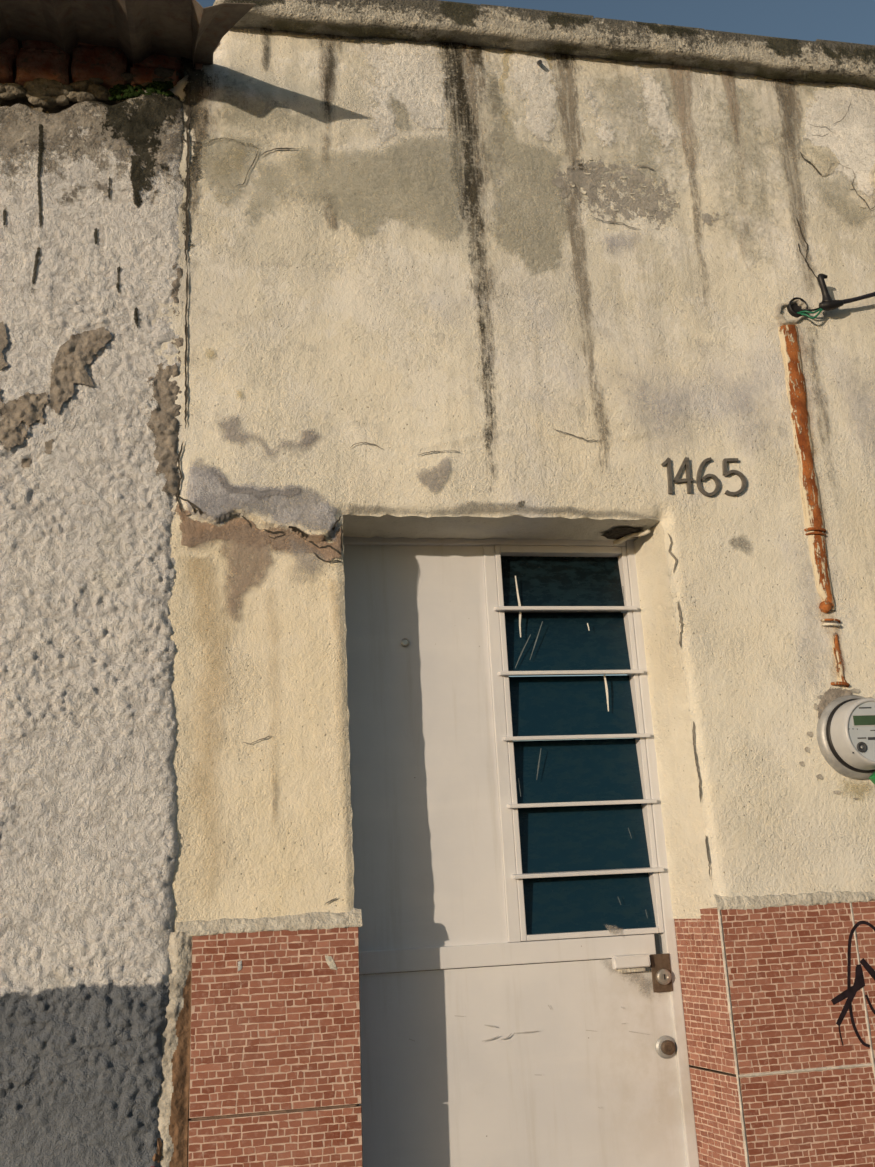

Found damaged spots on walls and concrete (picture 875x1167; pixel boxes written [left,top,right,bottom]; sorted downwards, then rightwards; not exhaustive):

leakage [440,1,481,26]
leakage [85,57,287,247]
peeling [801,83,875,222]
spalling [171,258,183,316]
leakage [314,33,608,463]
spalling [0,322,112,468]
spalling [143,337,342,561]
leakage [220,418,317,454]
leakage [419,458,450,491]
leakage [193,525,271,617]